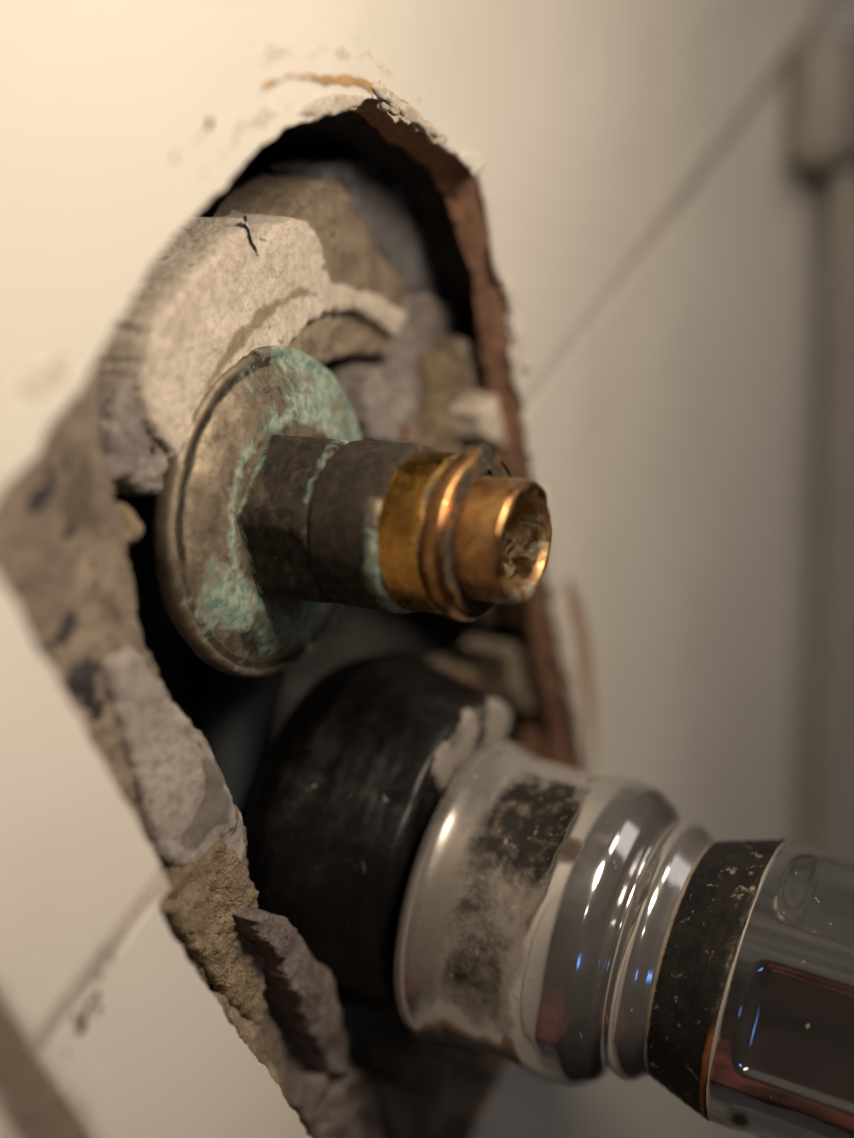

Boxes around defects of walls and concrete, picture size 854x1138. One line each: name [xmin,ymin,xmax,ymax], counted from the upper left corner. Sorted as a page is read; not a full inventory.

spalling [0,80,595,1138]